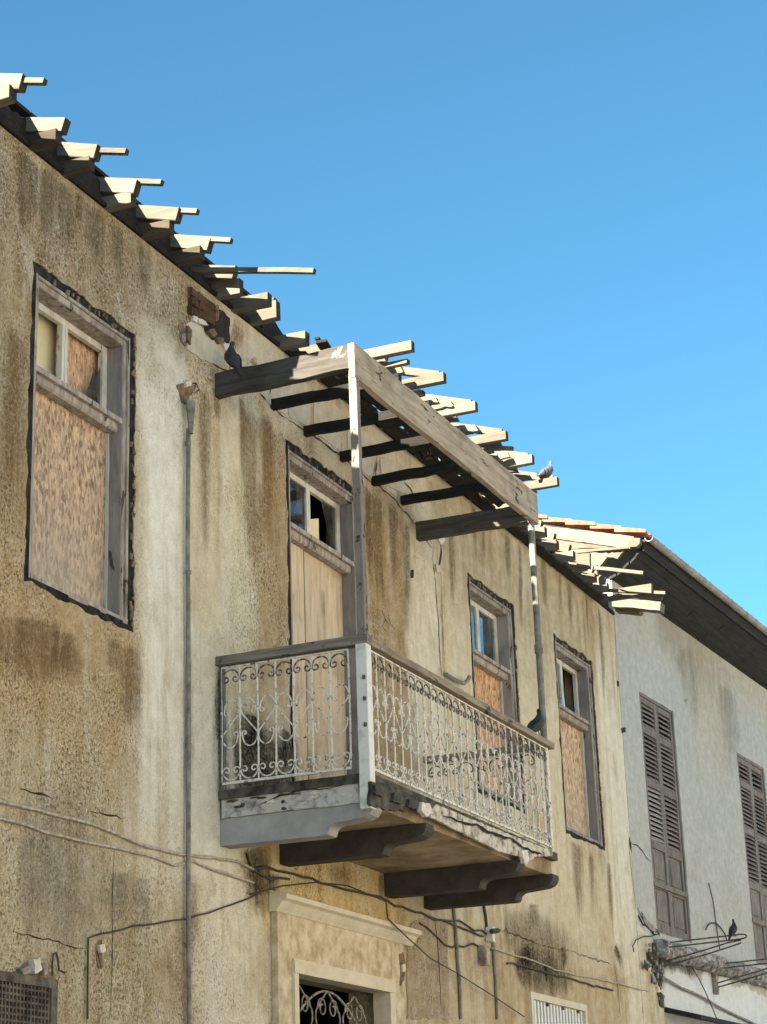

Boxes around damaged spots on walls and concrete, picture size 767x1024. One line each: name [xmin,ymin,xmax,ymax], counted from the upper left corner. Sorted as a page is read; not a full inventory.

flaking render [178,287,230,366]
leakage [201,390,219,509]
leakage [241,402,272,522]
leakage [510,912,566,989]